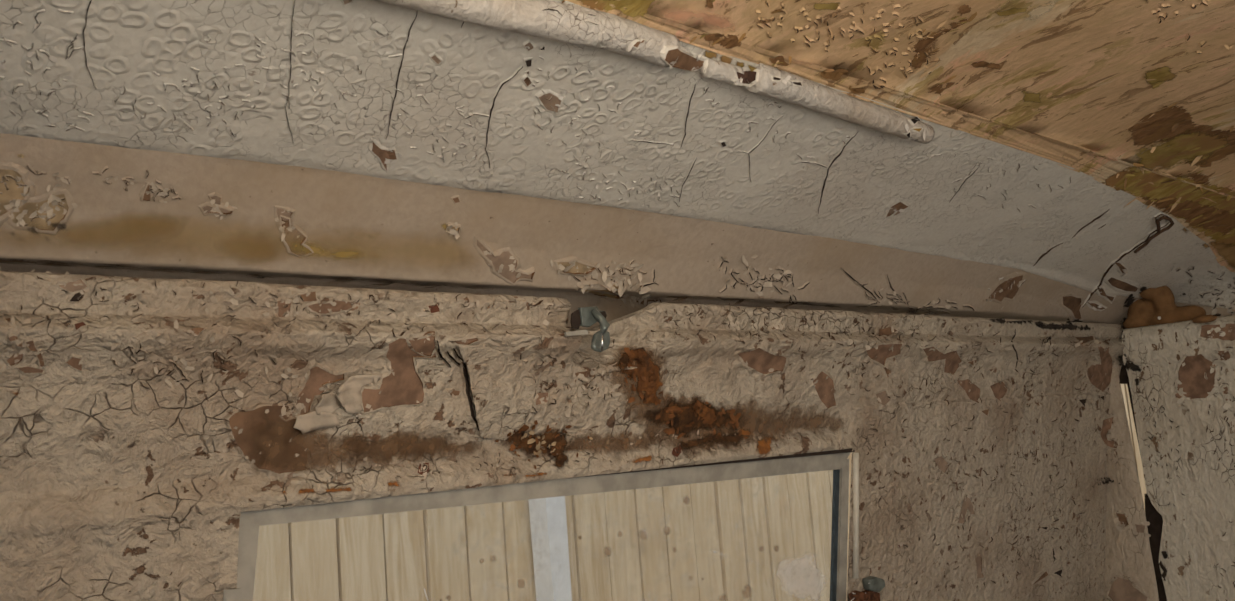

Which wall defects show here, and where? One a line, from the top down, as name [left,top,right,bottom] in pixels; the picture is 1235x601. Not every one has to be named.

spalling [660,45,709,77]
spalling [732,56,803,89]
crack [756,0,940,90]
crack [930,153,1071,212]
crack [1081,212,1169,307]
peeling [224,299,485,479]
corrosion [495,420,609,477]
crack [0,208,1110,589]
corrosion [612,346,772,455]
peeling [1058,261,1142,451]
crack [1137,266,1235,507]
peeling [1170,320,1235,436]